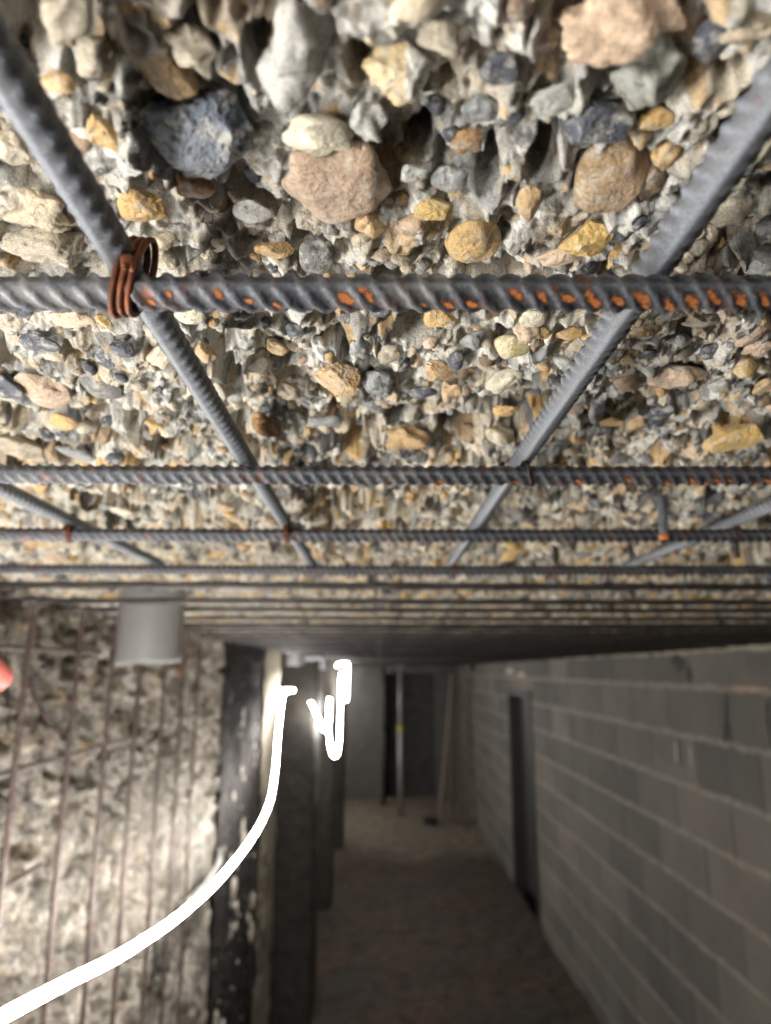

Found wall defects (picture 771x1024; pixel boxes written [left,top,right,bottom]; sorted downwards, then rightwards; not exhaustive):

corrosion [336,288,373,305]
corrosion [442,301,480,309]
corrosion [560,289,650,310]
corrosion [665,289,722,312]